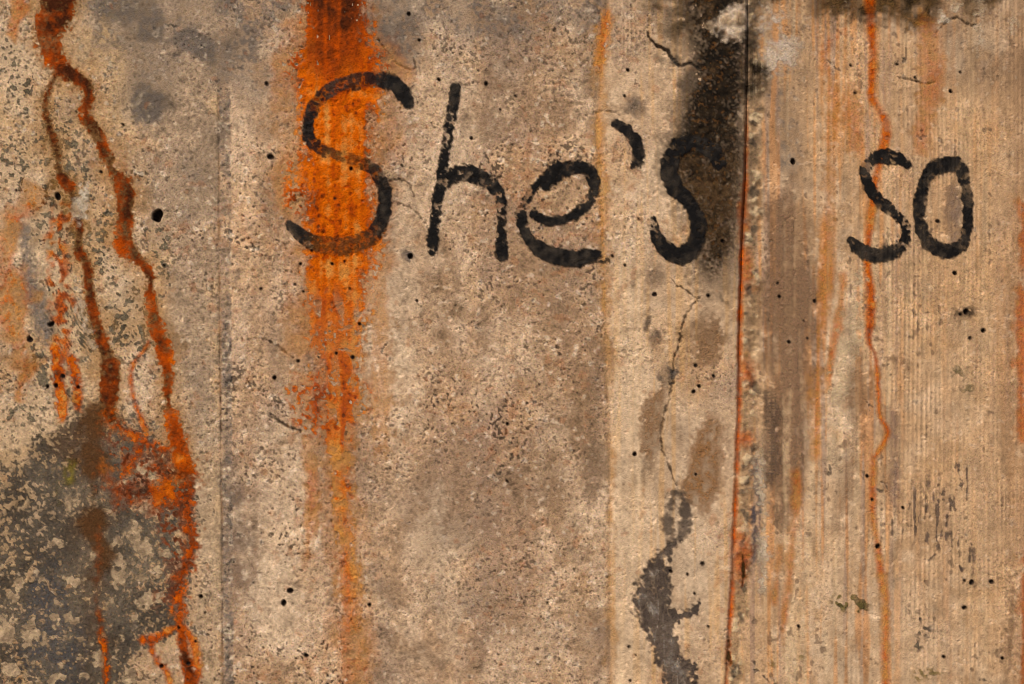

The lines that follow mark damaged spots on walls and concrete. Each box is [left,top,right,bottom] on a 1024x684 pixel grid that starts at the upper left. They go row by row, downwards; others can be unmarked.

corrosion [31,0,203,684]
corrosion [280,0,392,634]
crack [647,32,695,67]
damp [631,420,719,684]
damp [652,0,803,279]
corrosion [726,174,747,665]
damp [751,192,864,594]
corrosion [864,260,889,684]
corrosion [866,22,890,245]